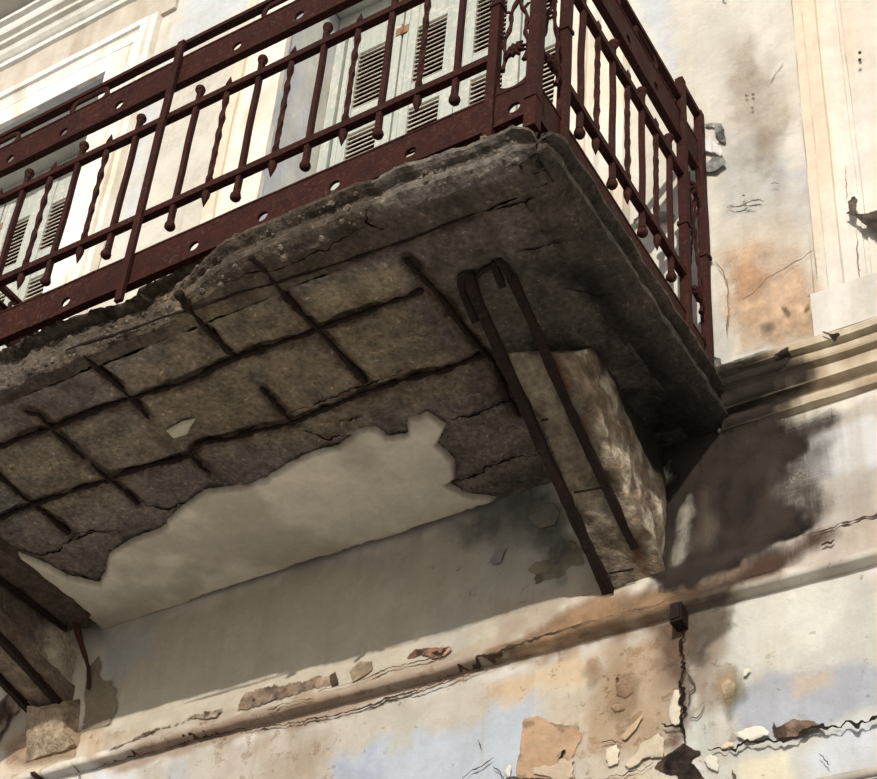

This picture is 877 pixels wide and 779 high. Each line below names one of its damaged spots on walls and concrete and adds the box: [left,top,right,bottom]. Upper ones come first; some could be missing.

peeling [705,123,726,172]
crack [715,243,814,335]
spalling [0,190,689,584]
leakage [650,353,839,598]
crack [802,513,877,546]
crack [610,567,634,575]
flaking render [238,672,338,710]
peeling [669,690,682,725]
crack [662,627,704,750]
flaking render [504,716,582,779]
peeling [606,715,665,768]
crack [708,715,877,779]